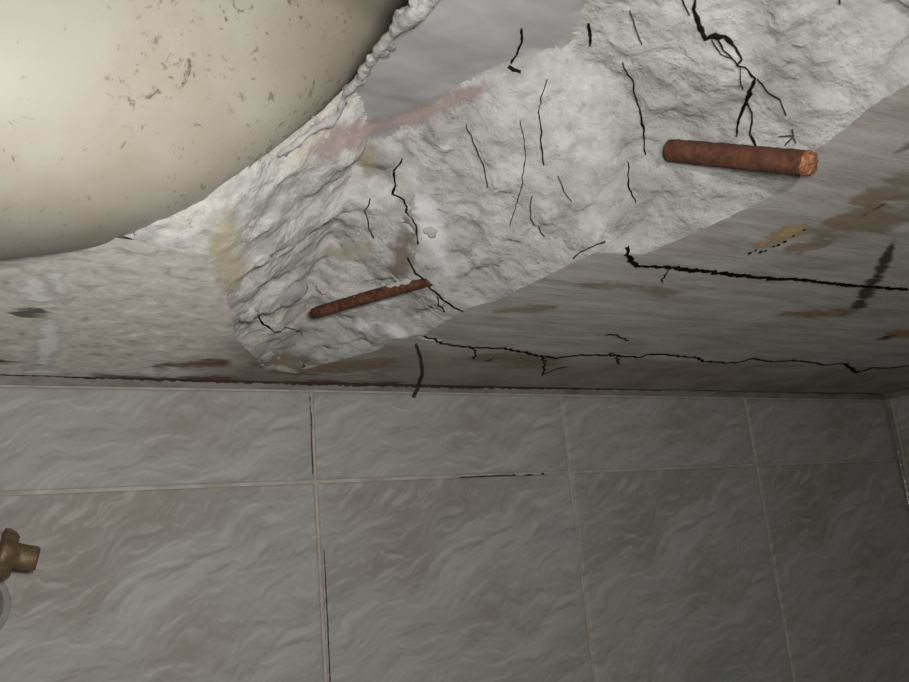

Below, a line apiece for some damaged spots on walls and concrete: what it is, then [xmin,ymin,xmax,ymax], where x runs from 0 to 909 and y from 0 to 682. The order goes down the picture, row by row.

crack [629,10,642,45]
crack [682,0,797,147]
crack [364,158,464,312]
crack [466,124,488,188]
spalling [124,0,909,370]
crack [510,79,572,237]
crack [622,62,646,203]
crack [573,241,909,290]
water stain [748,177,909,254]
crack [258,316,302,334]
crack [423,334,908,376]